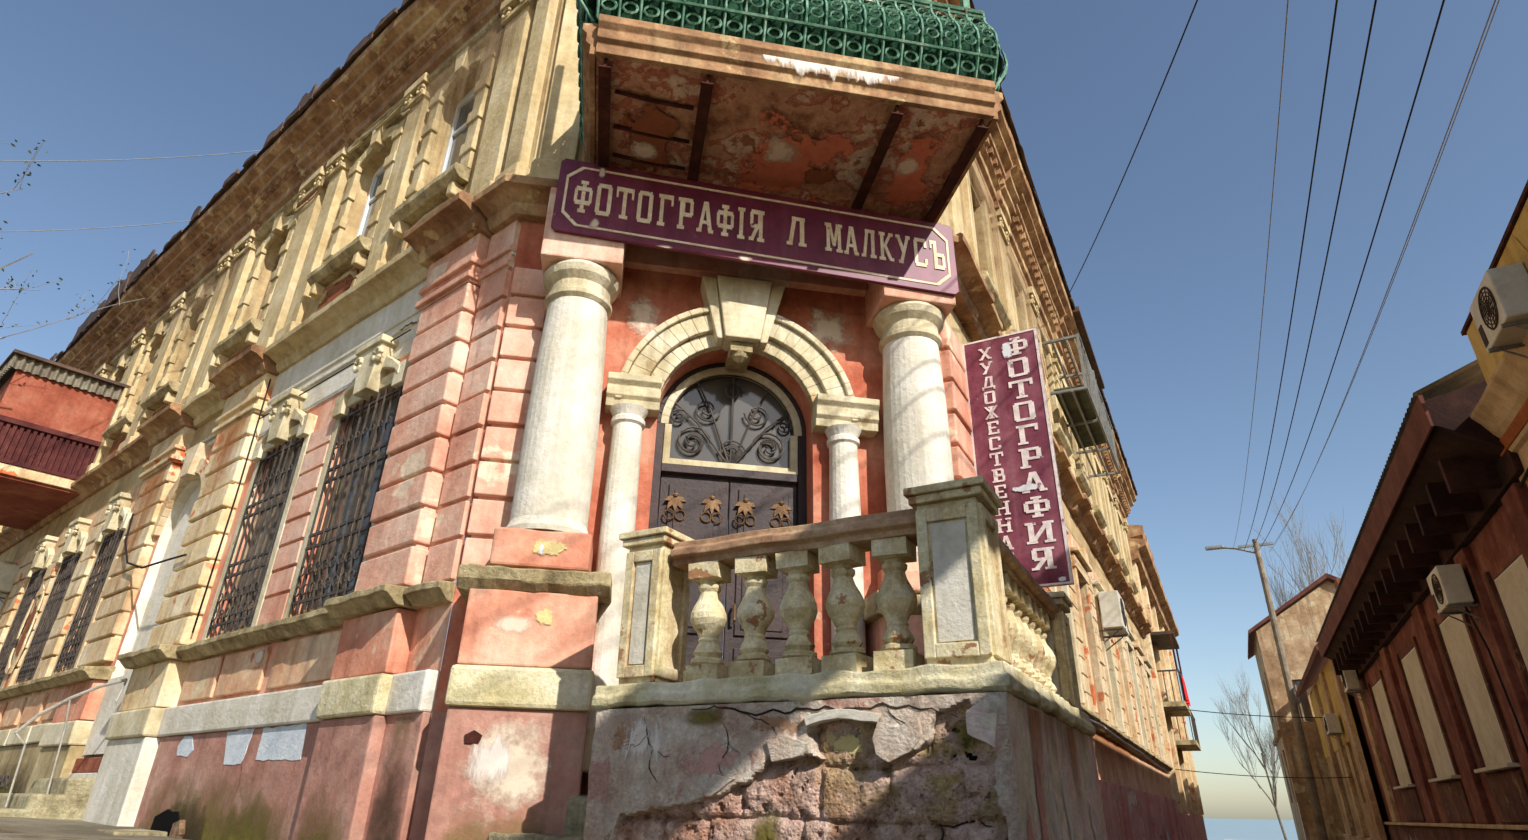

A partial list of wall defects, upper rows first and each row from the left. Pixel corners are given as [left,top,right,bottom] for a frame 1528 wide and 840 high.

damp [763,54,899,83]
spalling [622,103,680,172]
spalling [731,110,861,203]
spalling [880,134,947,207]
peeling [464,724,550,807]
crack [627,717,669,783]
spalling [607,699,1008,840]
crack [693,702,958,773]
crack [940,820,992,840]